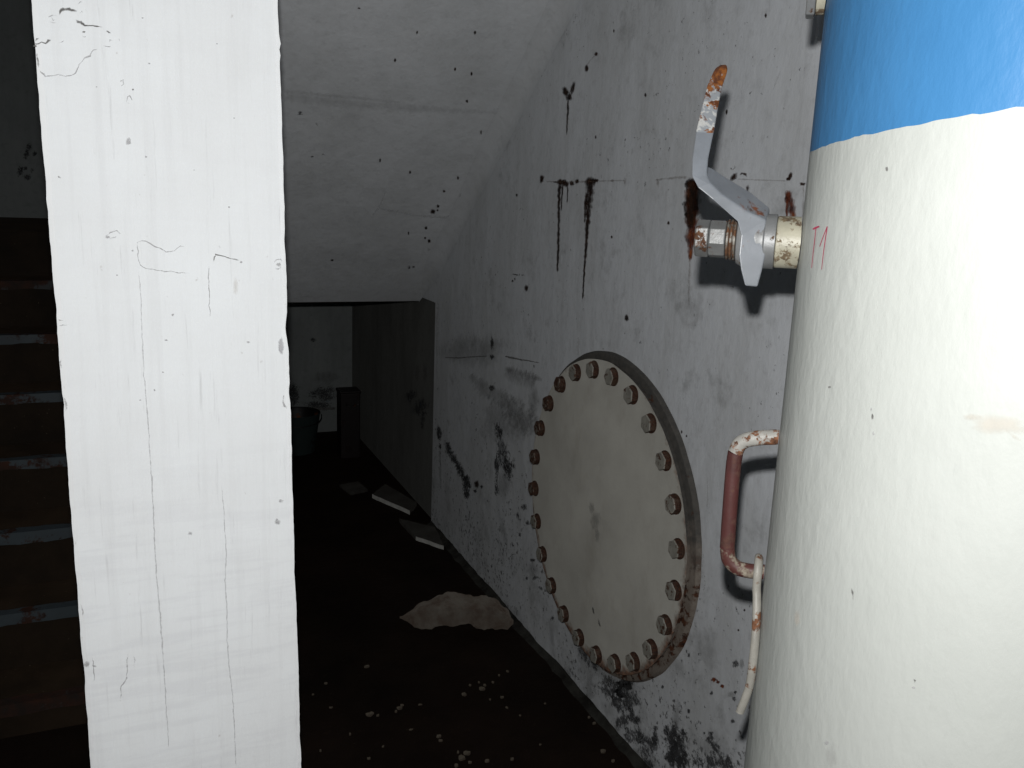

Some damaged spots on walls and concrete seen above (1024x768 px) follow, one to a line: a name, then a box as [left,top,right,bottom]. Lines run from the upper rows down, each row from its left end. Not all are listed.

crack [59,8,110,76]
corrosion [540,176,598,298]
corrosion [684,179,698,259]
mould [437,422,514,499]
mould [578,648,733,768]